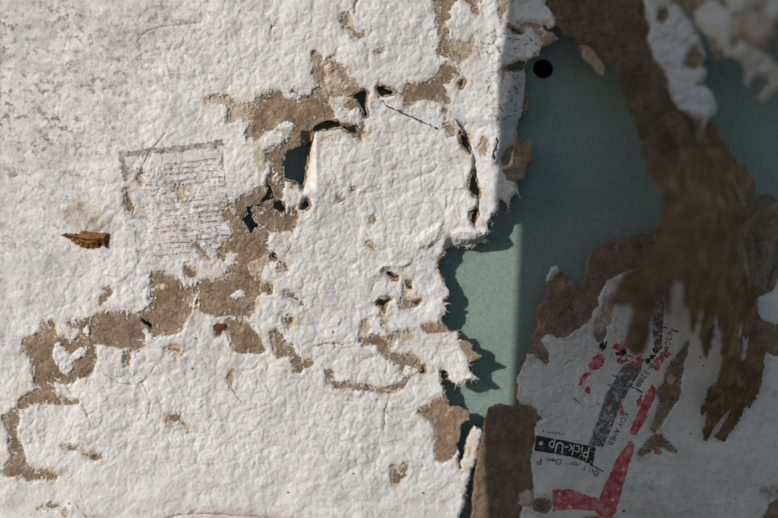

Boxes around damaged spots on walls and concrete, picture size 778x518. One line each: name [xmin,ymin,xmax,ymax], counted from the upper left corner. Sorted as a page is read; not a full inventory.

peeling [342,12,365,40]
peeling [395,0,482,137]
peeling [498,0,696,162]
peeling [501,138,534,182]
peeling [3,51,362,482]
peeling [530,339,549,366]
peeling [594,296,615,343]
peeling [419,391,470,463]
peeling [638,342,690,457]
peeling [532,497,552,515]